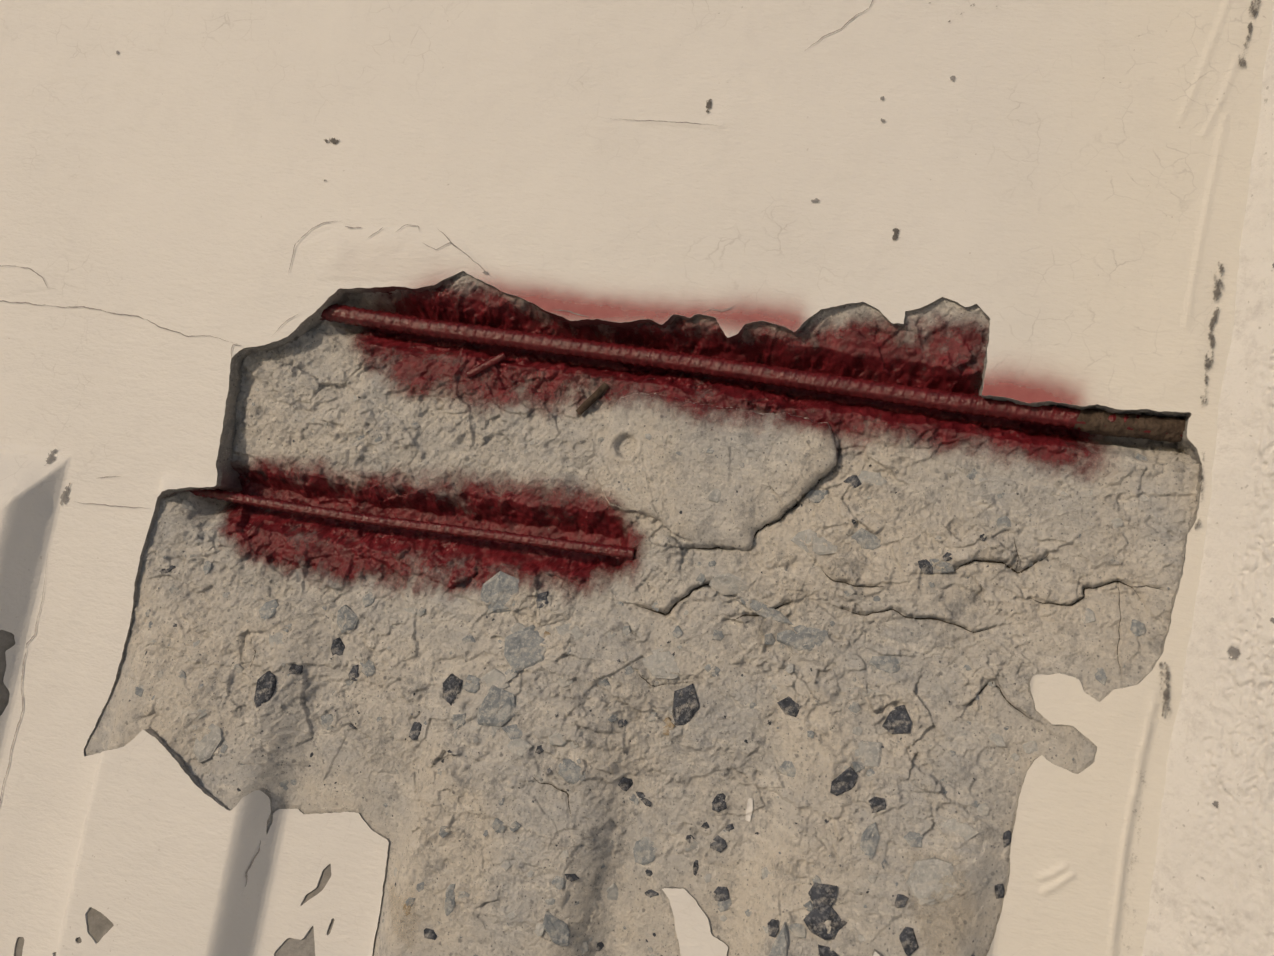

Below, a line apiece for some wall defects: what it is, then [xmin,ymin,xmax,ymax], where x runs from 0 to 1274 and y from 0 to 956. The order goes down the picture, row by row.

crack [806,0,873,50]
crack [288,221,490,276]
crack [2,265,241,359]
spalling [85,271,1199,956]
peeling [0,630,15,716]
peeling [15,937,24,956]
peeling [76,907,114,943]